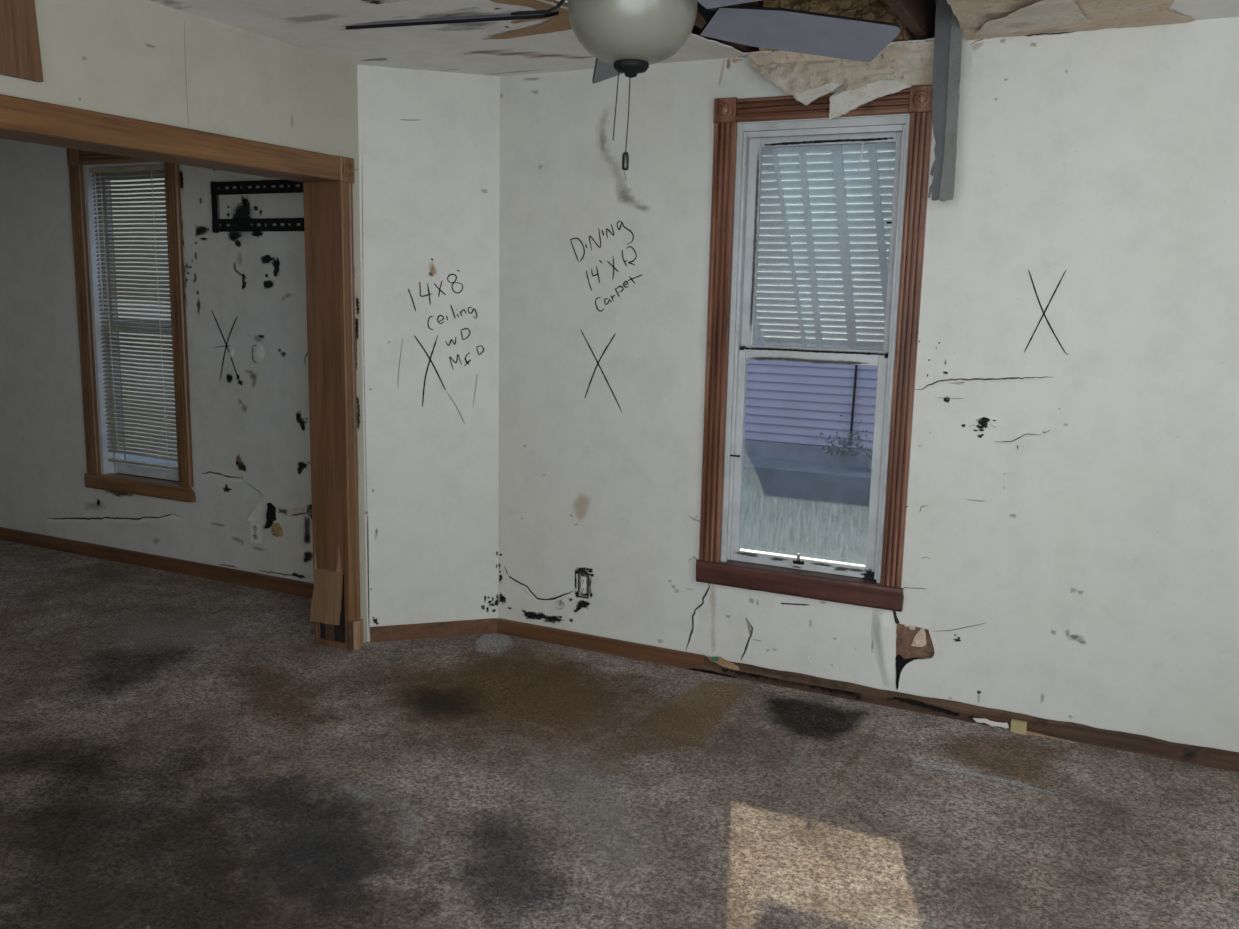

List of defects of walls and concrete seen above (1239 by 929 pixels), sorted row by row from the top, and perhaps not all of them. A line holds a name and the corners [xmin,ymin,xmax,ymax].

peeling [947,0,1195,70]
crack [914,340,1053,393]
crack [47,513,184,524]
flaking render [247,497,307,537]
crack [741,616,761,663]
flaking render [896,623,935,689]